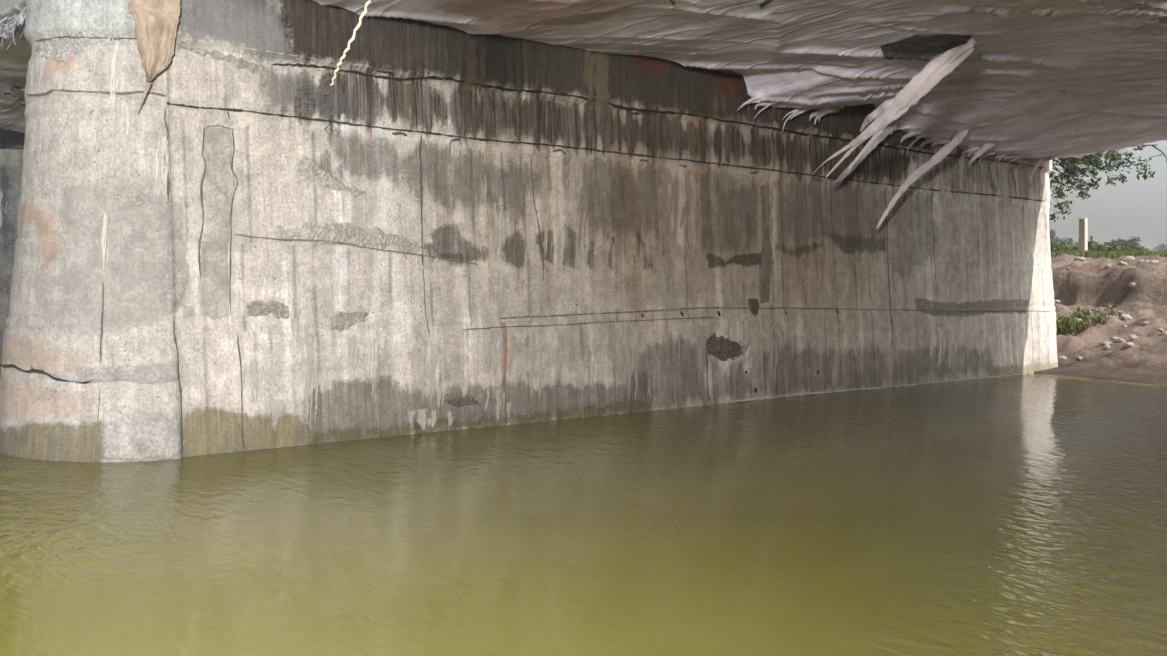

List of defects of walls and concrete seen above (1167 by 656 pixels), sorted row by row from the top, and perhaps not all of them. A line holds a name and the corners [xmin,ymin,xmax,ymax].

leakage [0,167,13,251]
leakage [0,128,25,148]
crack [26,89,1051,449]
leakage [179,0,931,268]
crack [272,63,1044,168]
leakage [939,150,1036,235]
crack [0,284,104,425]
leakage [290,302,984,440]